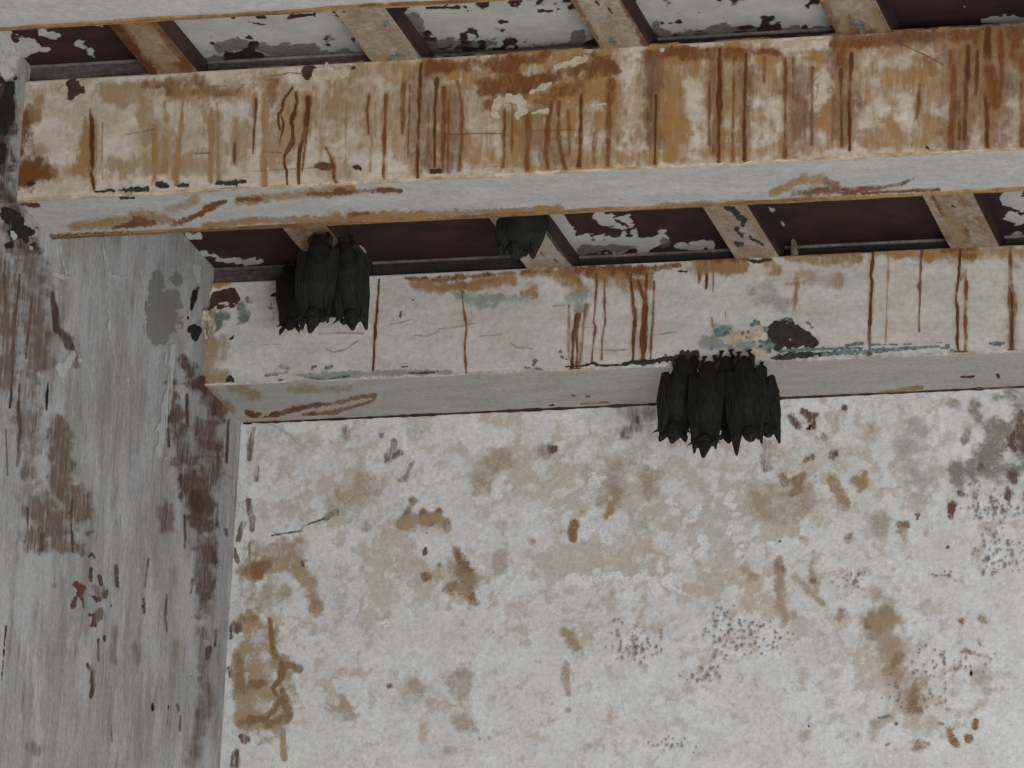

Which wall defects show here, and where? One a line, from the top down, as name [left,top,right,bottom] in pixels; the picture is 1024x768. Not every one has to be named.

flaking render [0,32,21,165]
flaking render [0,207,40,252]
peeling [94,181,189,200]
corrosion [0,0,1024,555]
peeling [559,311,954,368]
water stain [904,388,1024,519]
corrosion [159,335,377,765]
water stain [236,539,324,617]
water stain [563,521,649,590]
corrosion [774,556,825,623]
water stain [232,595,302,761]
corrosion [939,718,979,748]